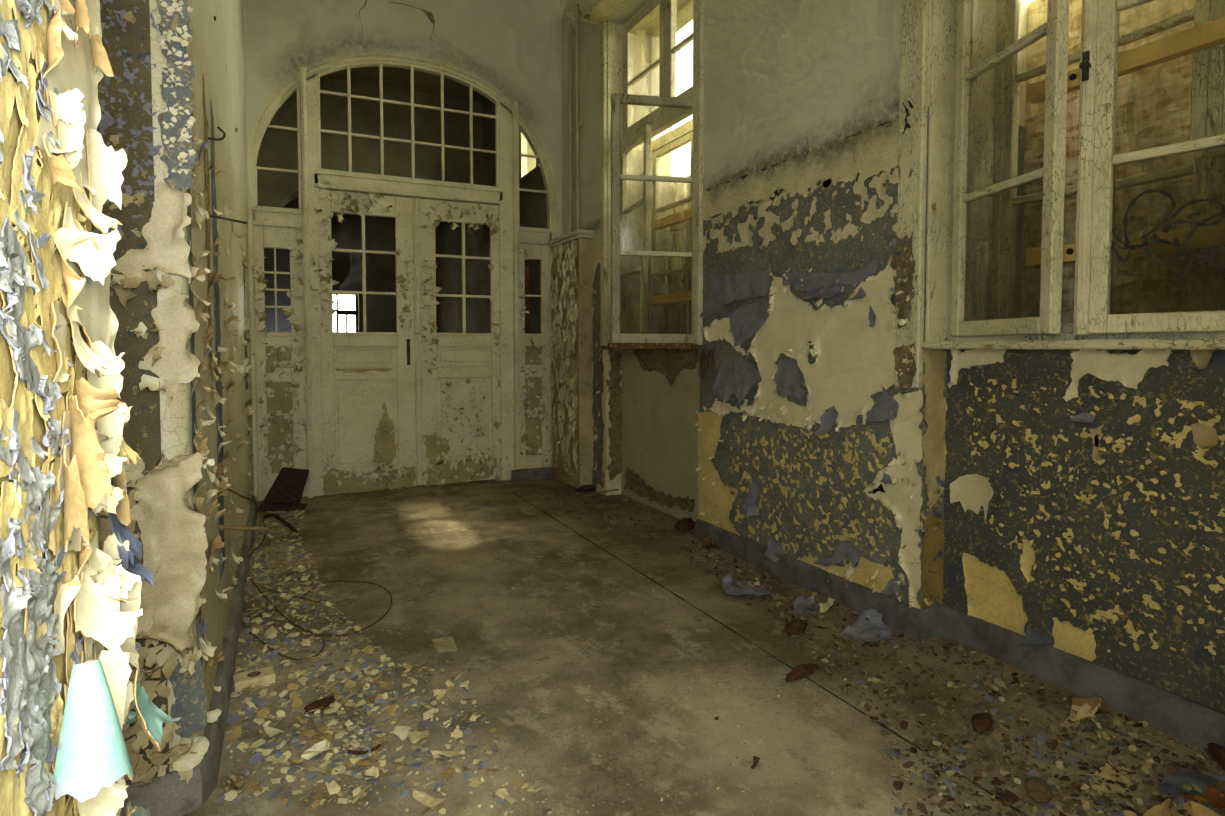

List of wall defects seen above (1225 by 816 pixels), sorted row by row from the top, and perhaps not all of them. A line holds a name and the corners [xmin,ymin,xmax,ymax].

crack [359,0,435,48]
peeling [0,0,394,816]
peeling [306,113,1225,662]